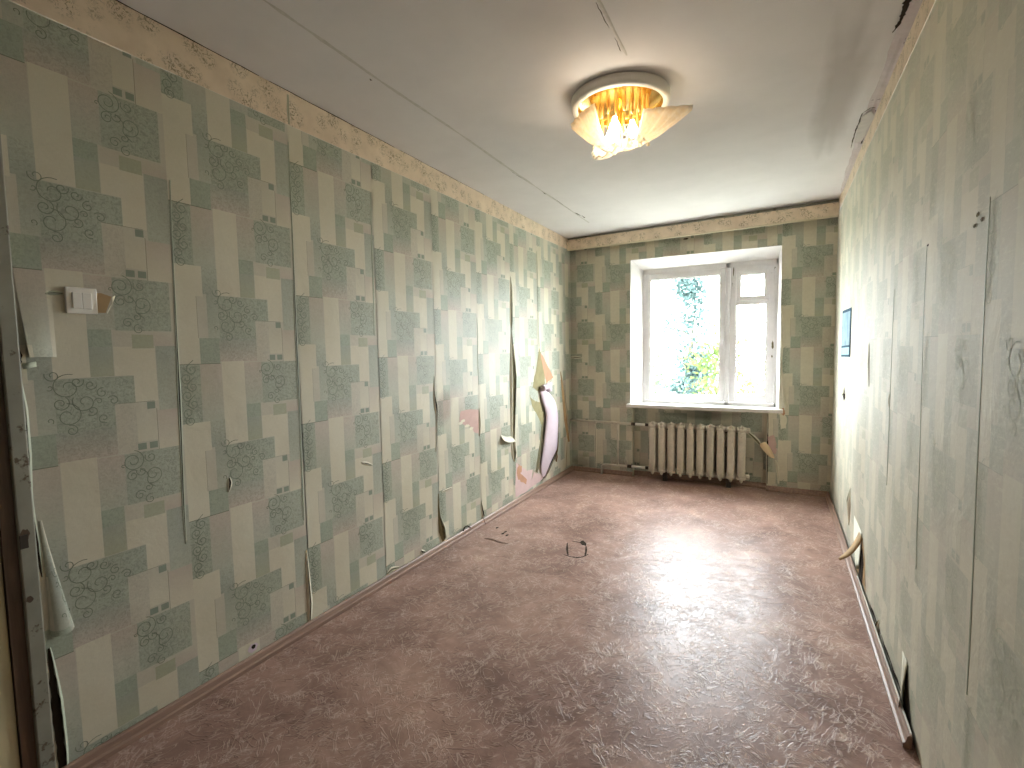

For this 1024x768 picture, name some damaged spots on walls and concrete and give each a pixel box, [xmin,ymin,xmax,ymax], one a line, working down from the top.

crack [596,0,627,56]
crack [892,0,912,40]
peeling [12,259,57,369]
peeling [20,388,74,768]